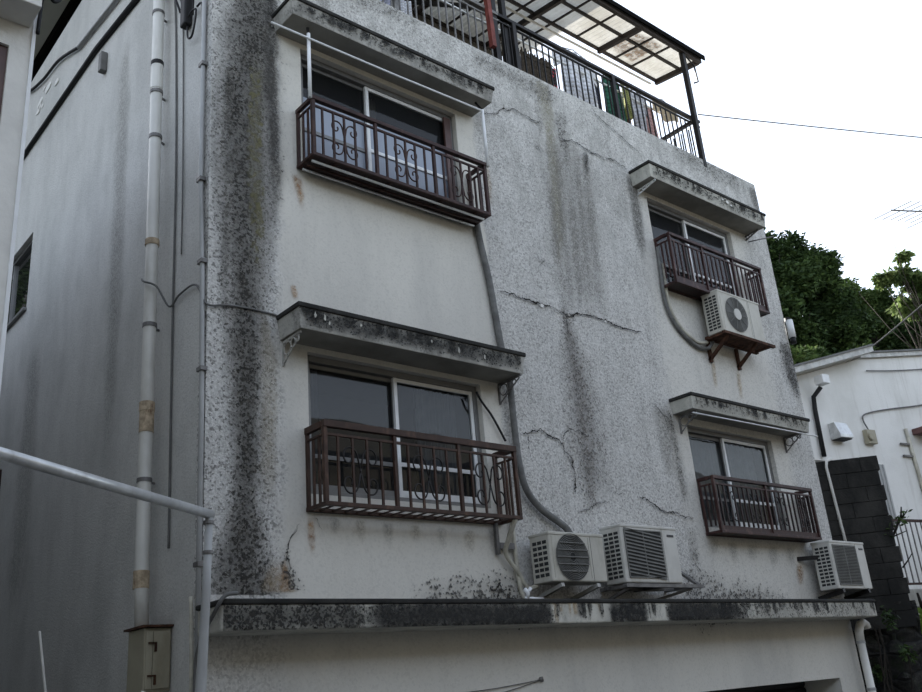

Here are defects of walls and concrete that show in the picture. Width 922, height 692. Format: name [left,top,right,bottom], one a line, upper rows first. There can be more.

crack [480,106,641,172]
damp [629,179,643,244]
damp [211,0,569,631]
crack [497,290,640,335]
crack [523,428,694,519]
damp [578,528,875,633]